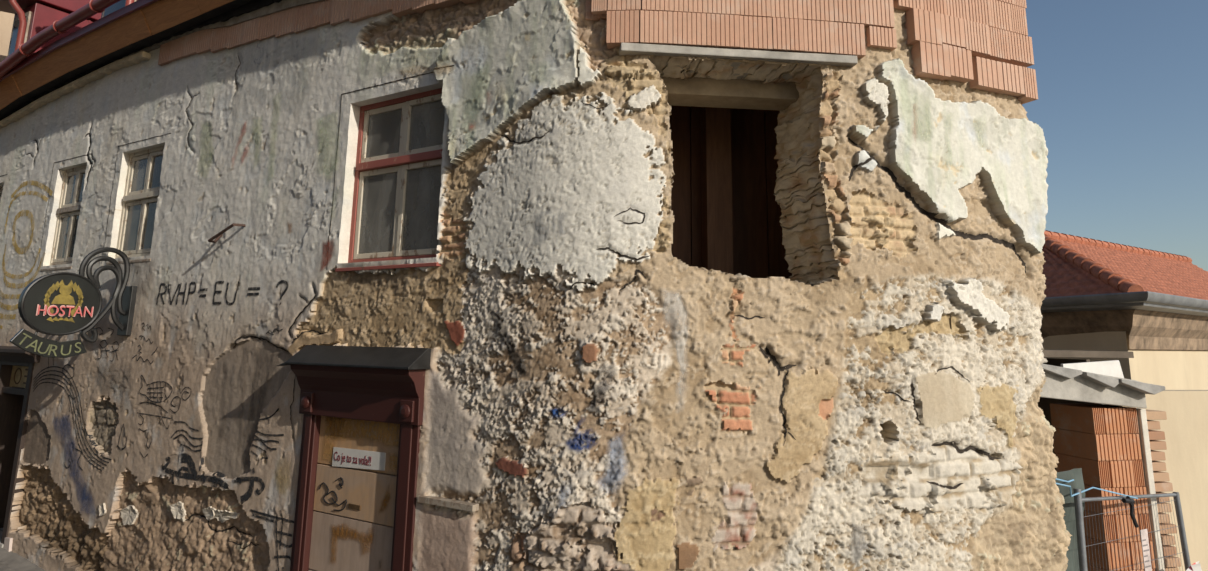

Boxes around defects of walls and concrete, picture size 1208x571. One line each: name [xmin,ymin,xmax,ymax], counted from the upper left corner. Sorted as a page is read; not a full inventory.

peeling [296,0,668,355]
spalling [818,70,918,266]
crack [849,138,1026,273]
peeling [856,58,1049,253]
spalling [14,337,293,571]
spalling [509,476,758,571]
spalling [704,380,758,433]
crack [735,315,797,446]
spalling [858,370,1023,515]
spalling [875,277,1010,356]
crack [884,366,1001,460]
crack [927,481,963,489]